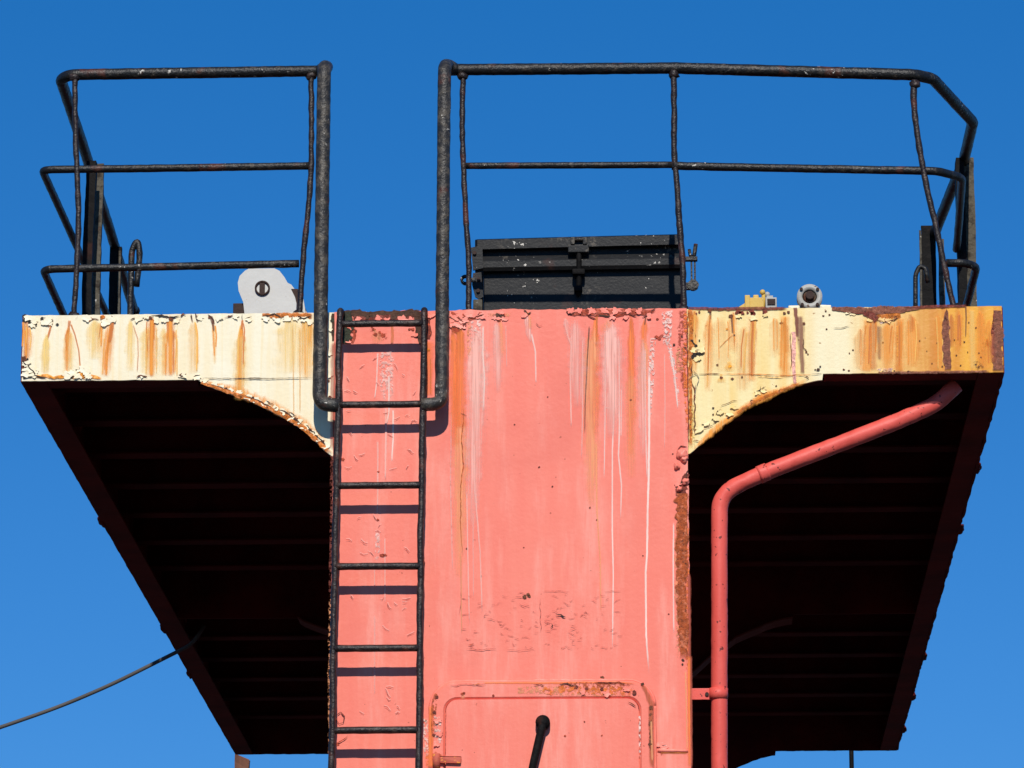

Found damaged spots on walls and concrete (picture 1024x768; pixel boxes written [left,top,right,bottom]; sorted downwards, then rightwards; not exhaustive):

rust [22,322,51,370]
rust [91,321,114,374]
rust [128,316,178,375]
peeling [131,312,314,325]
peeling [178,371,331,452]
peeling [327,309,435,356]
damp [564,319,584,449]
peeling [566,307,655,320]
damp [450,321,489,628]
damp [601,321,622,638]
damp [638,311,679,661]
rust [451,493,692,764]